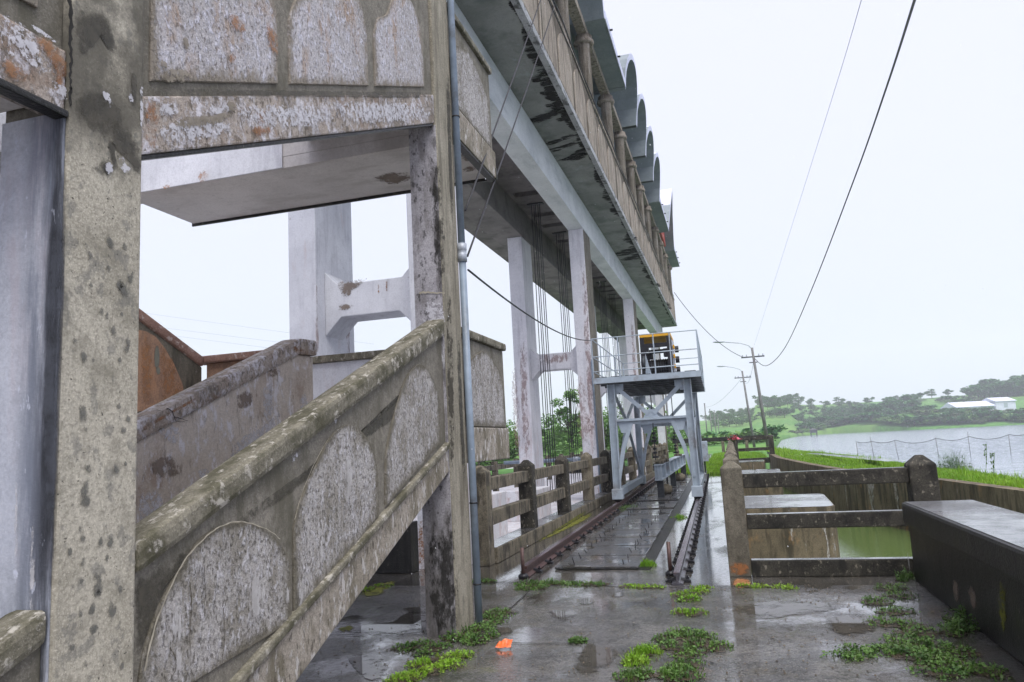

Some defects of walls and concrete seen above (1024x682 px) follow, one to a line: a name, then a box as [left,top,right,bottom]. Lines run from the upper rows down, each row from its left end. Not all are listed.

damp [77,14,115,53]
damp [79,74,143,174]
peeling [160,101,431,144]
damp [431,86,476,277]
damp [509,1,674,324]
damp [421,299,465,473]
mould [429,531,458,636]
corrosion [730,563,751,588]